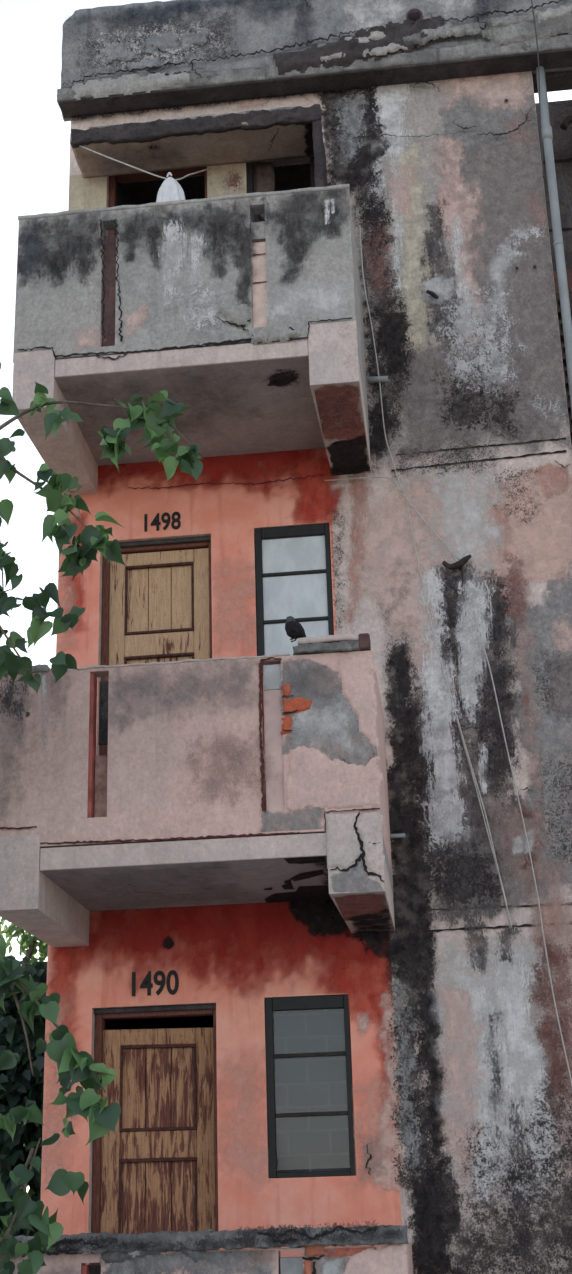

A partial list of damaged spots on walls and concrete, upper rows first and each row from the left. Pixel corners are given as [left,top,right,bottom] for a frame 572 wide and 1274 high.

spalling [273,5,572,75]
leakage [17,84,529,523]
crack [0,657,384,882]
leakage [45,465,572,1274]
peeling [261,633,385,892]
peeling [359,994,402,1191]
peeling [302,1244,408,1274]